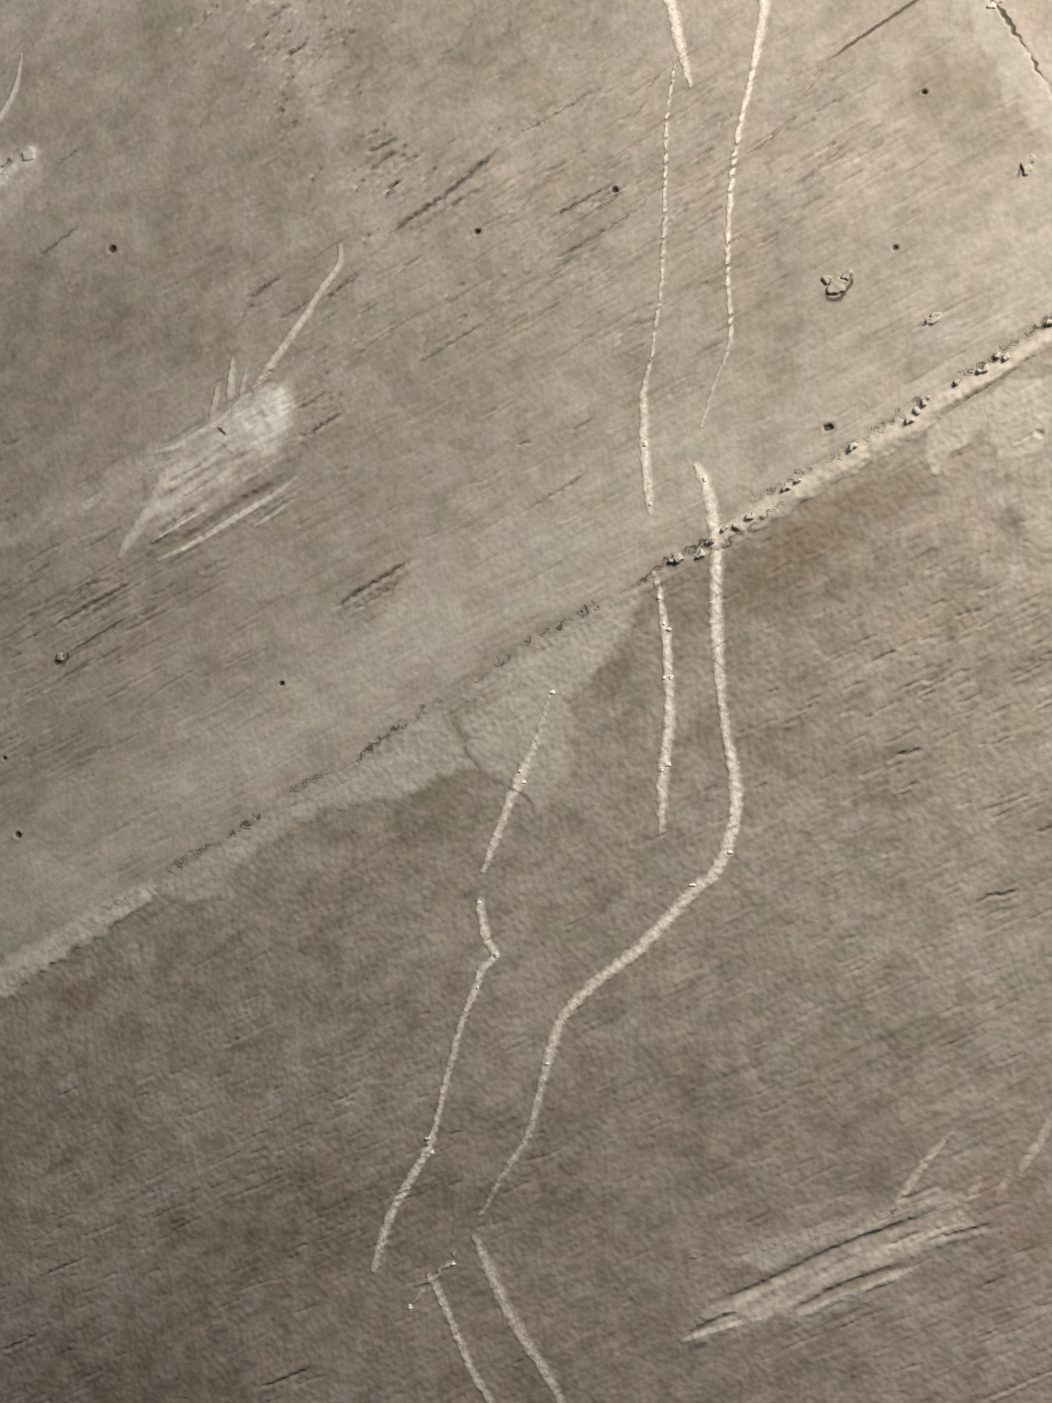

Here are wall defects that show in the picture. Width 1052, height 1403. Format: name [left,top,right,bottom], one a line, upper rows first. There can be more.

crack [986,0,1052,92]
crack [741,0,921,192]
crack [243,81,608,324]
crack [542,180,658,266]
crack [407,318,493,373]
crack [568,416,596,433]
crack [514,467,595,518]
damp [990,501,1029,544]
crack [323,552,423,617]
damp [571,450,944,717]
damp [384,771,490,907]
damp [0,1104,51,1243]